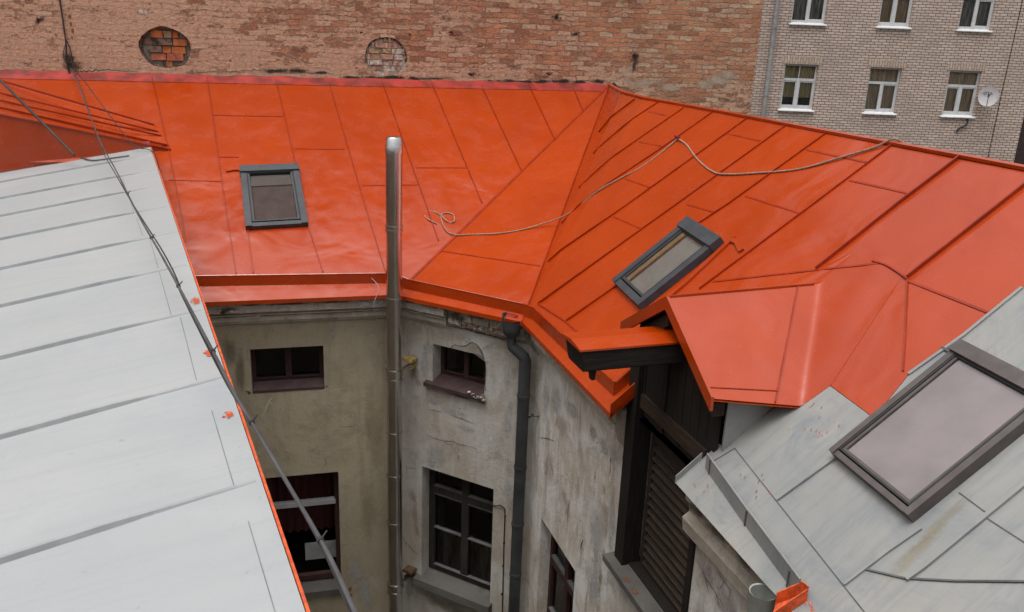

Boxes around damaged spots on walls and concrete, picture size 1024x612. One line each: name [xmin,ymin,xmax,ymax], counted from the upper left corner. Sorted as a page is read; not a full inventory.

spalling [447,310,506,403]